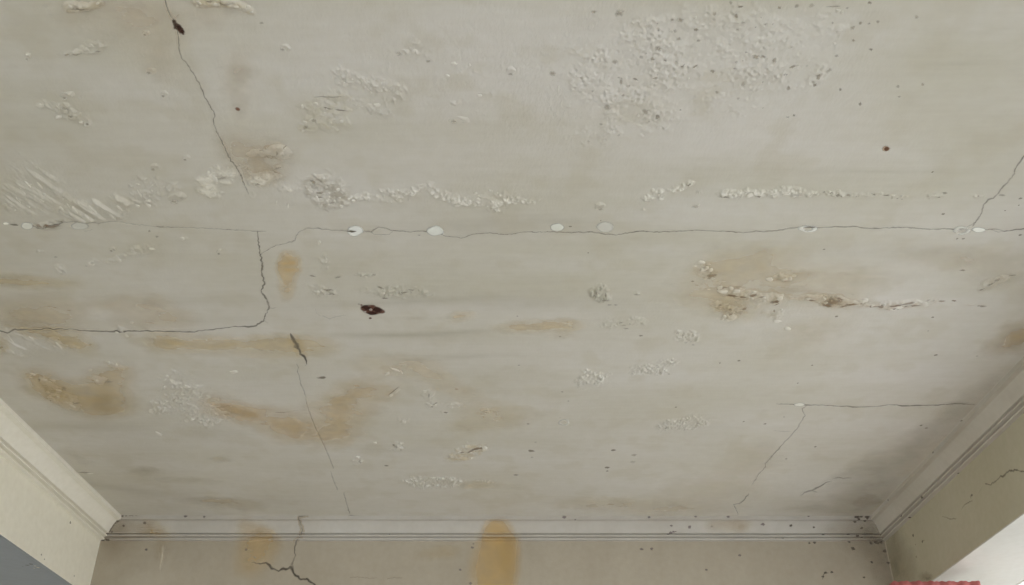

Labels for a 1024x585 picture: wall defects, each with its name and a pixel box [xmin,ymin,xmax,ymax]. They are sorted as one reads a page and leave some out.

crack [163,0,250,195]
peeling [32,191,137,231]
peeling [295,167,355,213]
crack [361,153,1024,240]
crack [0,231,273,335]
rust [361,304,385,319]
crack [287,332,310,373]
crack [776,401,975,410]
crack [254,516,315,585]
damp [470,521,515,585]